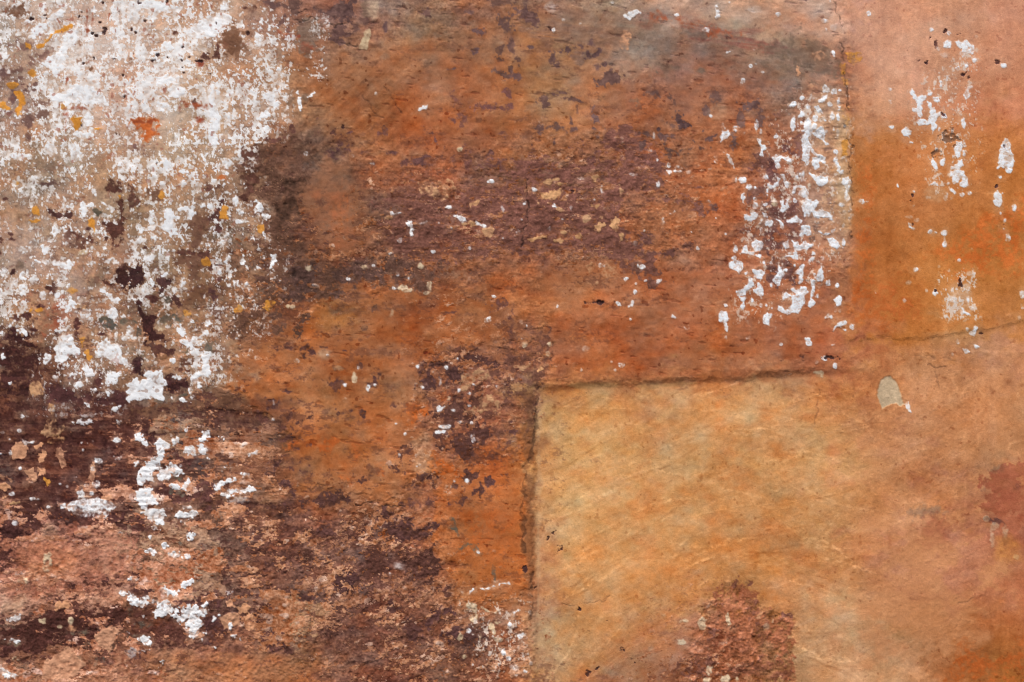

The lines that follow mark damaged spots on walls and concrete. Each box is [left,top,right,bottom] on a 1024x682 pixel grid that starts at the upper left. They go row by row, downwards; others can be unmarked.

rust [297,177,372,258]
peeling [705,65,869,378]
rust [841,133,1024,340]
peeling [888,27,984,248]
peeling [992,137,1017,242]
water stain [0,282,82,399]
peeling [0,0,719,682]
water stain [253,386,372,512]
rust [475,443,519,486]
water stain [0,588,230,667]
flaking render [619,574,799,682]
rust [942,633,1024,682]